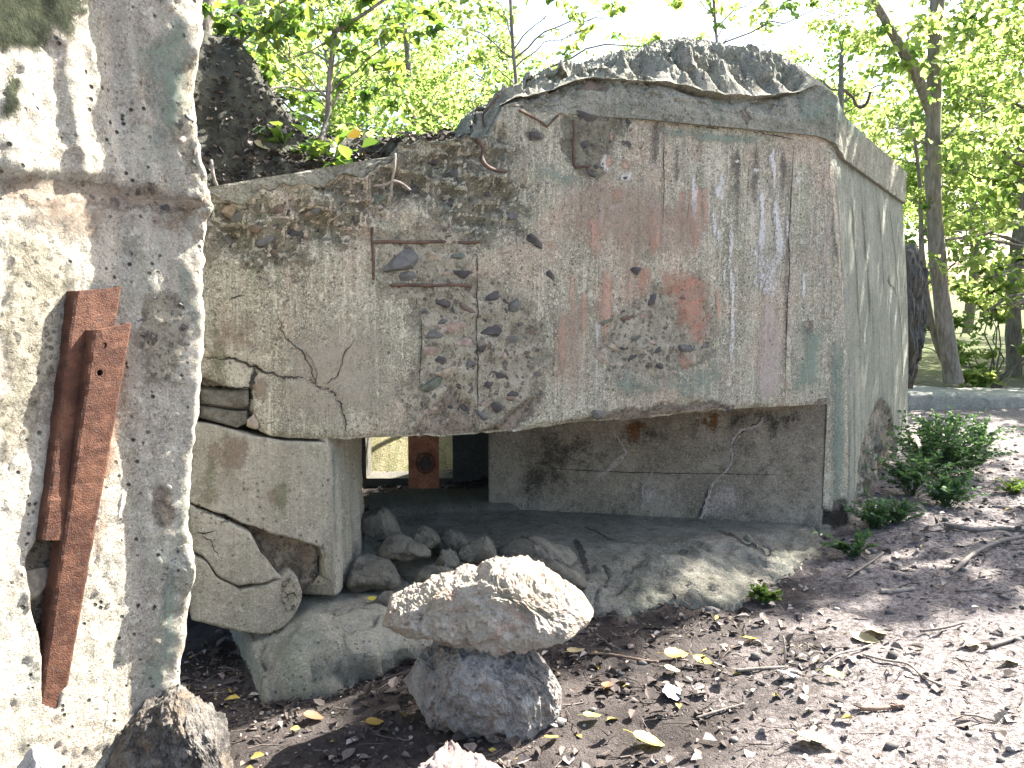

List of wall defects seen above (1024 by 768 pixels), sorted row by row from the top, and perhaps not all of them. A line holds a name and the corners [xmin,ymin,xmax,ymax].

spalling [514,75,632,179]
spalling [0,56,552,461]
corrosion [105,370,128,477]
crack [200,314,356,437]
crack [198,507,236,560]
crack [697,417,767,556]